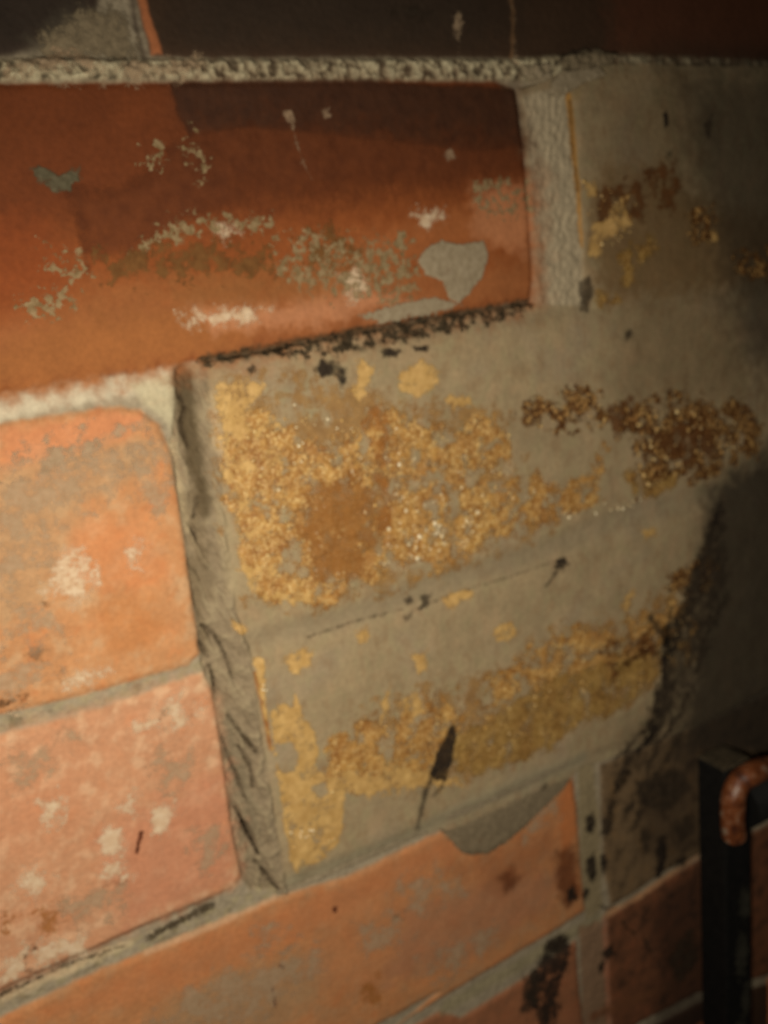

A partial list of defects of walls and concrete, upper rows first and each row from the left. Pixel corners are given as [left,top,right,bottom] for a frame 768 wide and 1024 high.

peeling [135,139,165,173]
peeling [182,122,212,188]
leakage [188,307,256,326]
peeling [13,209,463,324]
leakage [343,268,370,301]
peeling [213,359,765,614]
peeling [253,549,719,873]